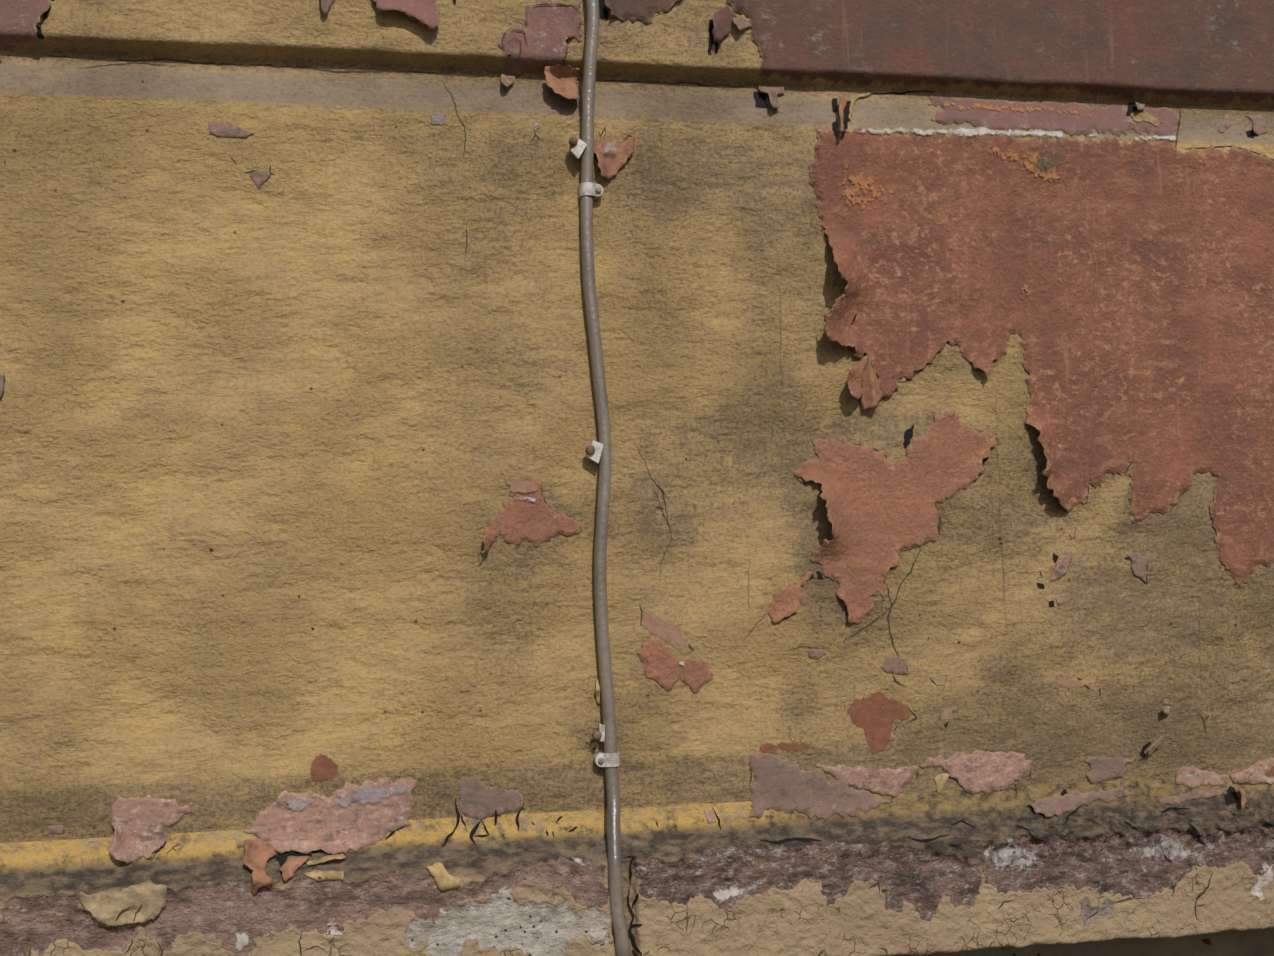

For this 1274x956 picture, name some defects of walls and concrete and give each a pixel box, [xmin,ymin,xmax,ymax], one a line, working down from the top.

peeling [372,0,440,31]
peeling [708,0,1274,587]
peeling [744,409,997,639]
crack [124,933,170,956]
peeling [0,777,610,956]
crack [627,855,643,956]
crack [761,836,822,844]
crack [869,870,920,893]
crack [907,820,975,842]
peeling [748,750,1135,820]
peeling [631,827,1274,926]
crack [1084,807,1213,926]